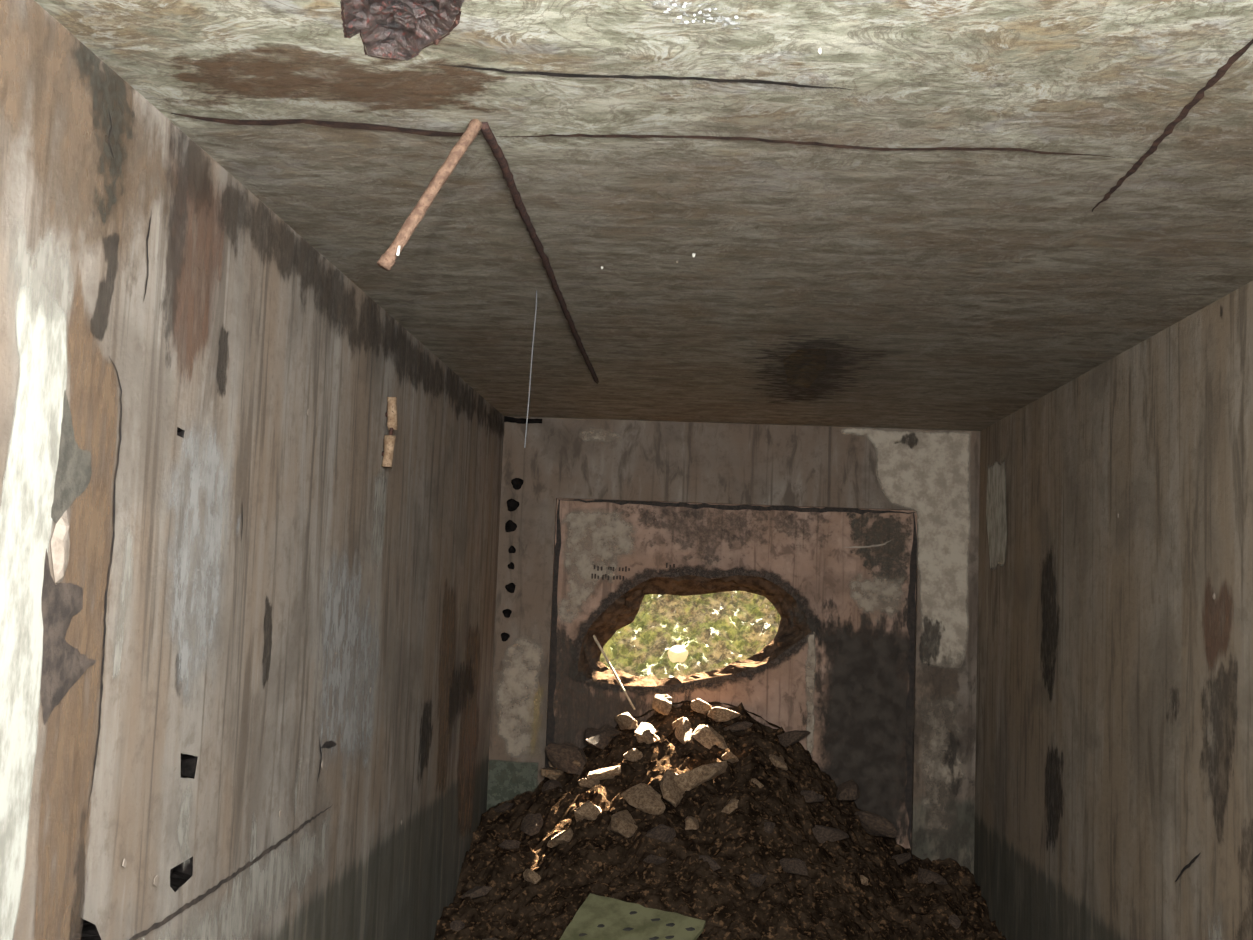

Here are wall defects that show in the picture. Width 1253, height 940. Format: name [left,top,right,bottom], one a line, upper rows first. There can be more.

spalling [340,0,464,61]
crack [171,39,1253,212]
hole [573,565,819,696]